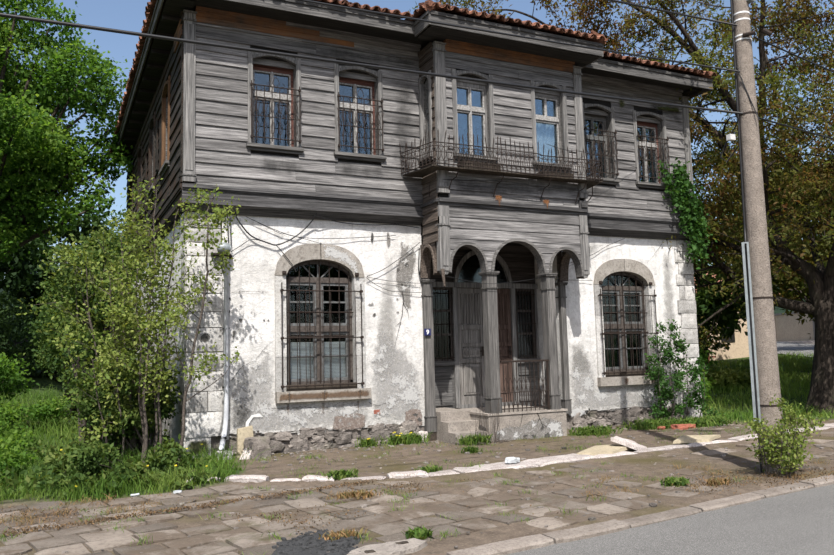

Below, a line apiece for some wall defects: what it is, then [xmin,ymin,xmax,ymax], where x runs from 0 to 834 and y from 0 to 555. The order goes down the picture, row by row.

peeling [396,242,416,309]
peeling [233,333,422,430]
peeling [570,352,680,417]